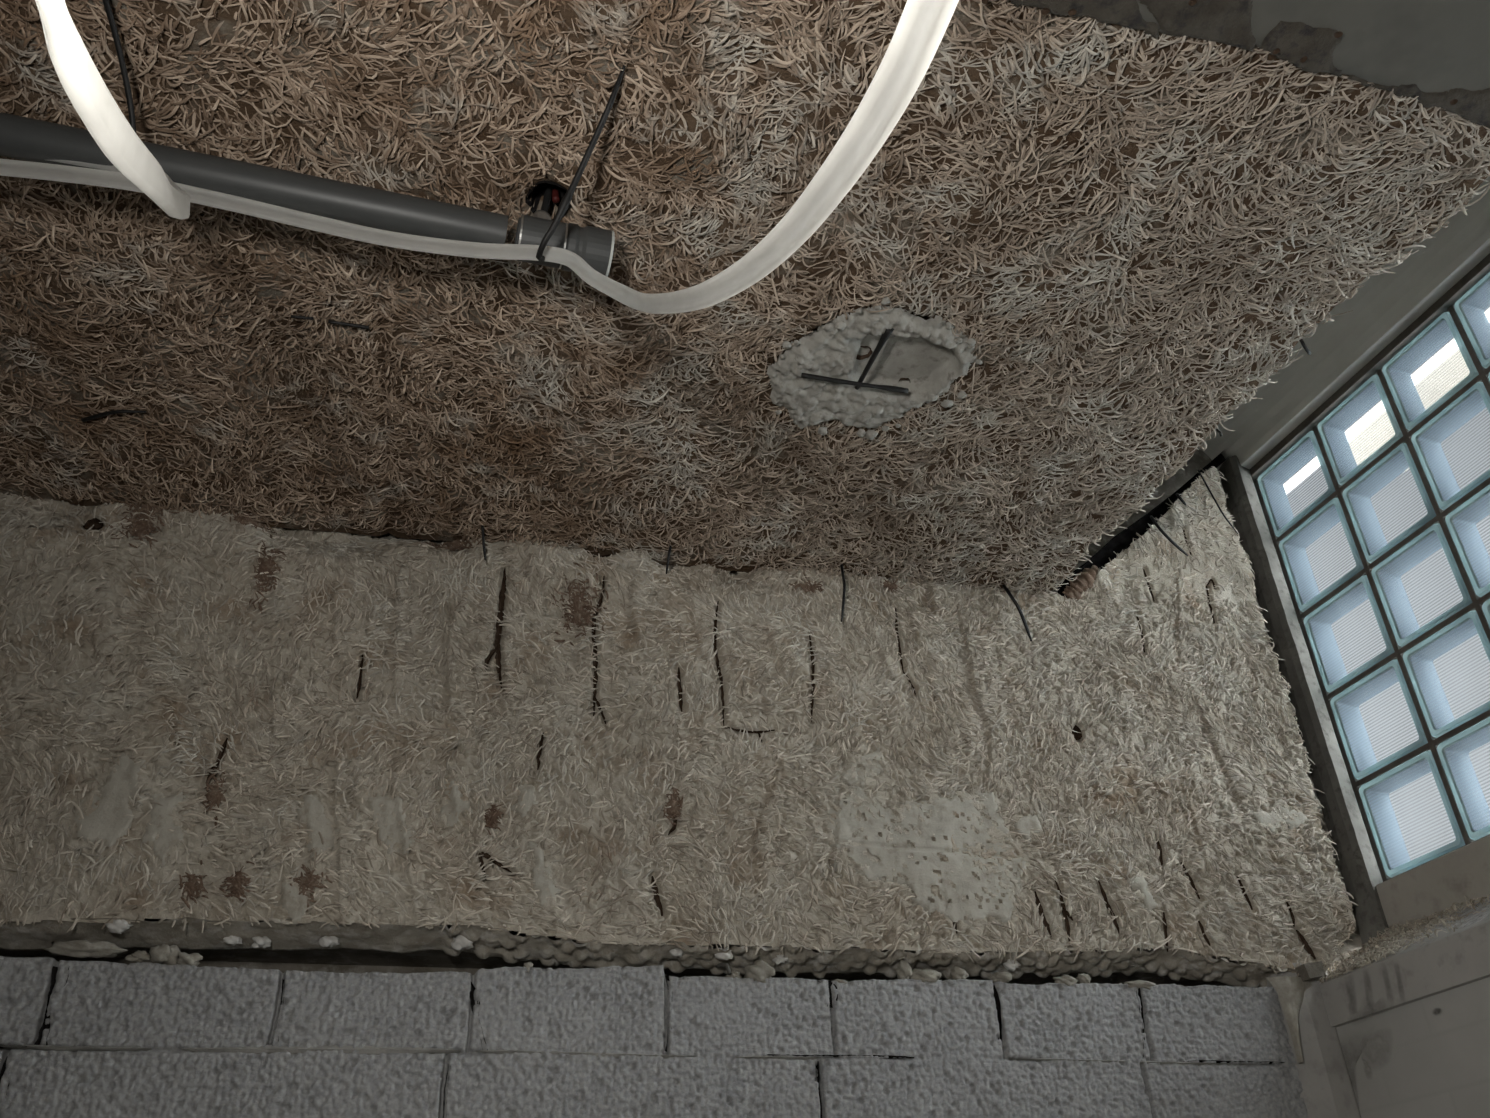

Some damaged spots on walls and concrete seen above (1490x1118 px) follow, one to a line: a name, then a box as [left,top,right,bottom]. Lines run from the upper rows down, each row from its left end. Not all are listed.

peeling [1010,0,1490,133]
spalling [766,297,982,440]
crack [355,655,363,698]
crack [484,568,506,688]
crack [591,575,606,724]
crack [676,667,684,712]
crack [713,601,775,742]
crack [808,633,816,722]
crack [895,608,916,695]
crack [536,733,544,770]
crack [478,852,513,880]
crack [651,876,663,916]